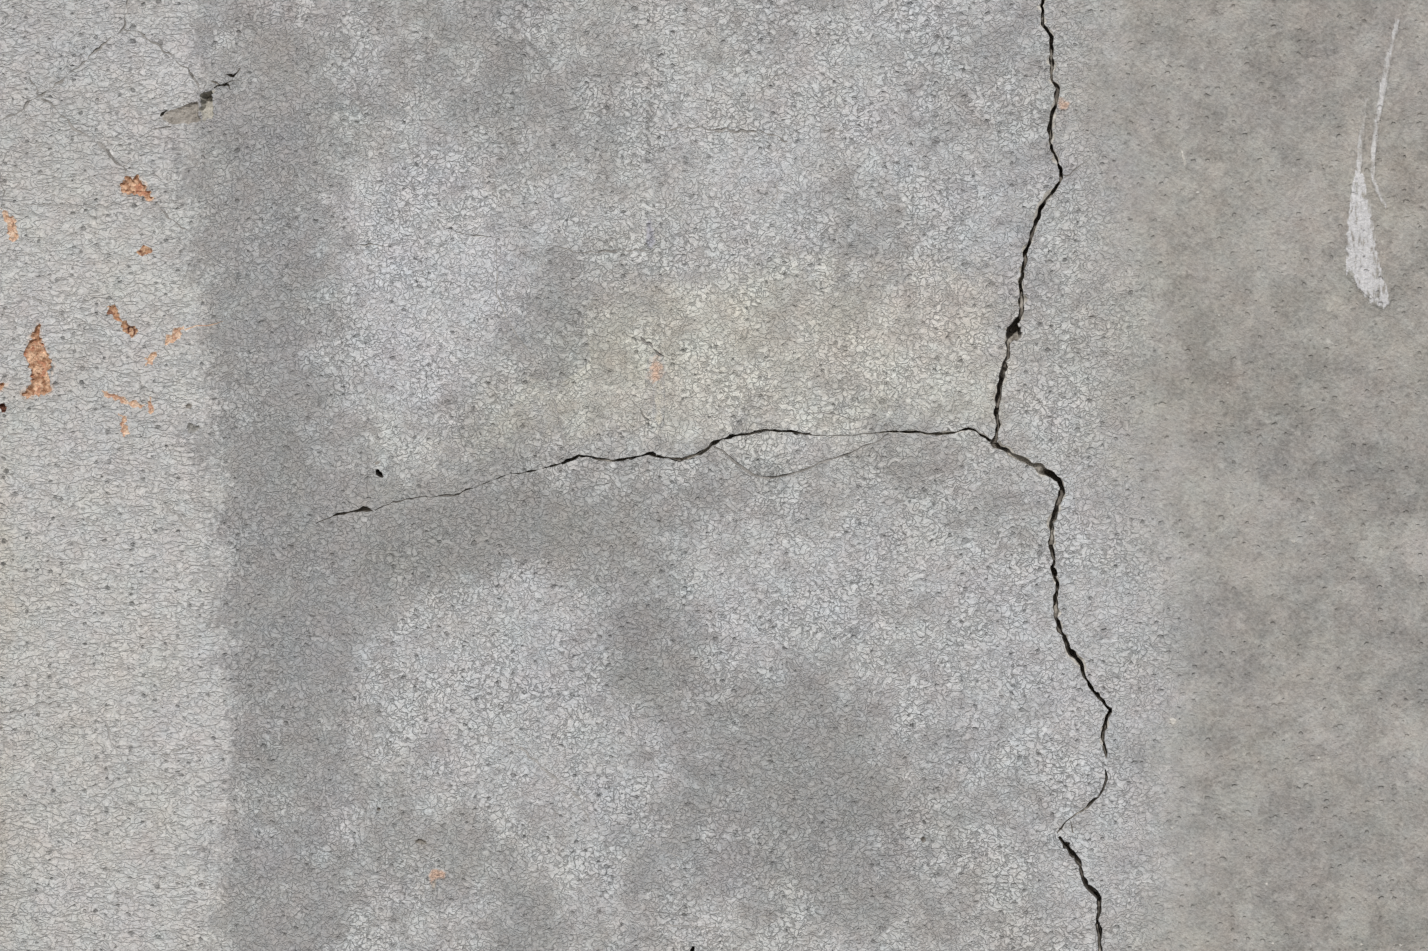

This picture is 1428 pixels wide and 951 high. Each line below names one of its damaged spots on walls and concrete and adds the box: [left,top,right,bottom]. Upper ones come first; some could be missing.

peeling [114,168,161,210]
peeling [1,208,19,242]
peeling [136,245,152,256]
peeling [107,304,138,338]
peeling [0,315,61,405]
peeling [144,326,184,366]
peeling [101,390,155,437]
crack [316,0,1112,951]